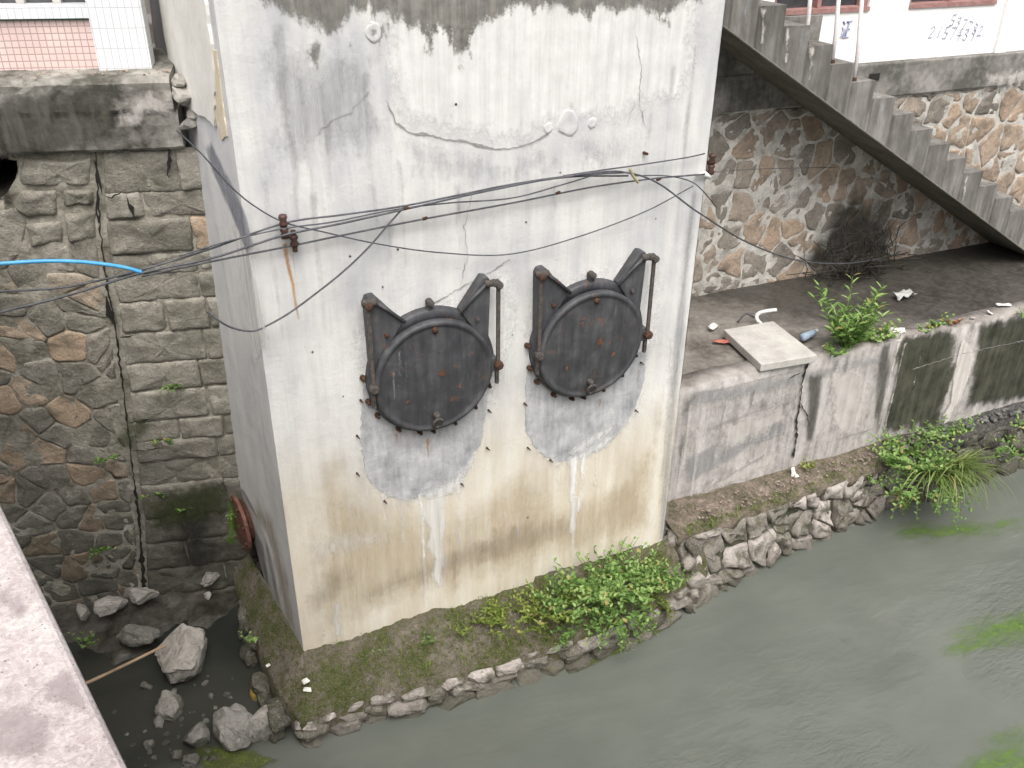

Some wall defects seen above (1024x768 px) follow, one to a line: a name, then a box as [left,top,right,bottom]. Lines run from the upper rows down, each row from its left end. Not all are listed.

crack [165,149,173,178]
crack [93,152,159,588]
crack [690,363,873,458]
damp [419,488,444,586]
damp [570,454,586,544]